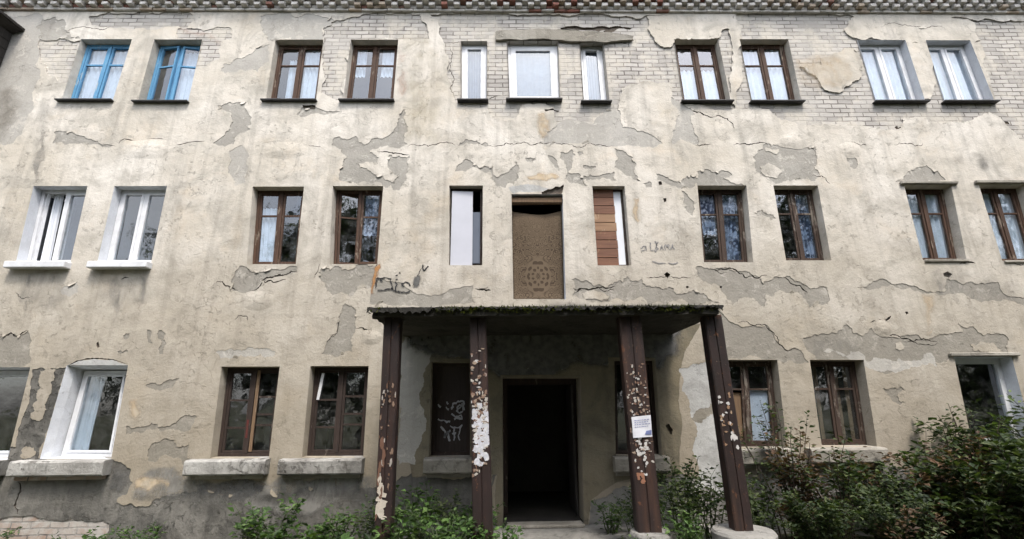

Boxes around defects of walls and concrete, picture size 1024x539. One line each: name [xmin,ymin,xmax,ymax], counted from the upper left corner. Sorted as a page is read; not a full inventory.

flaking render [89,12,1024,216]
peeling [229,266,297,293]
peeling [318,264,475,357]
peeling [572,266,1024,374]
peeling [0,330,497,539]